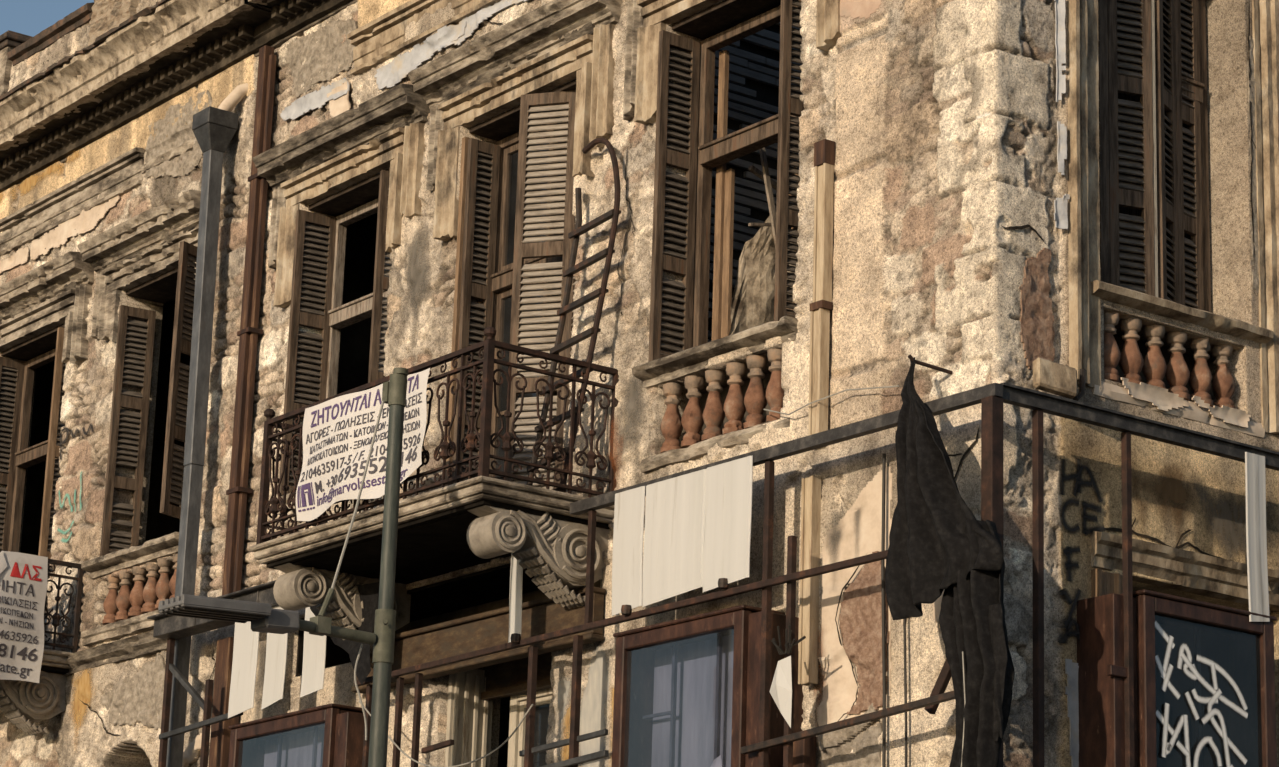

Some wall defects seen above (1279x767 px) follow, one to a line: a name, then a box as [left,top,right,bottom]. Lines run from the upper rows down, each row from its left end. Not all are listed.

flaking render [280,18,358,121]
peeling [374,0,528,90]
peeling [0,195,120,274]
peeling [1121,377,1251,428]
leakage [1131,469,1246,555]
leakage [1266,502,1274,546]
flaking render [818,466,903,767]
peeling [931,590,944,622]